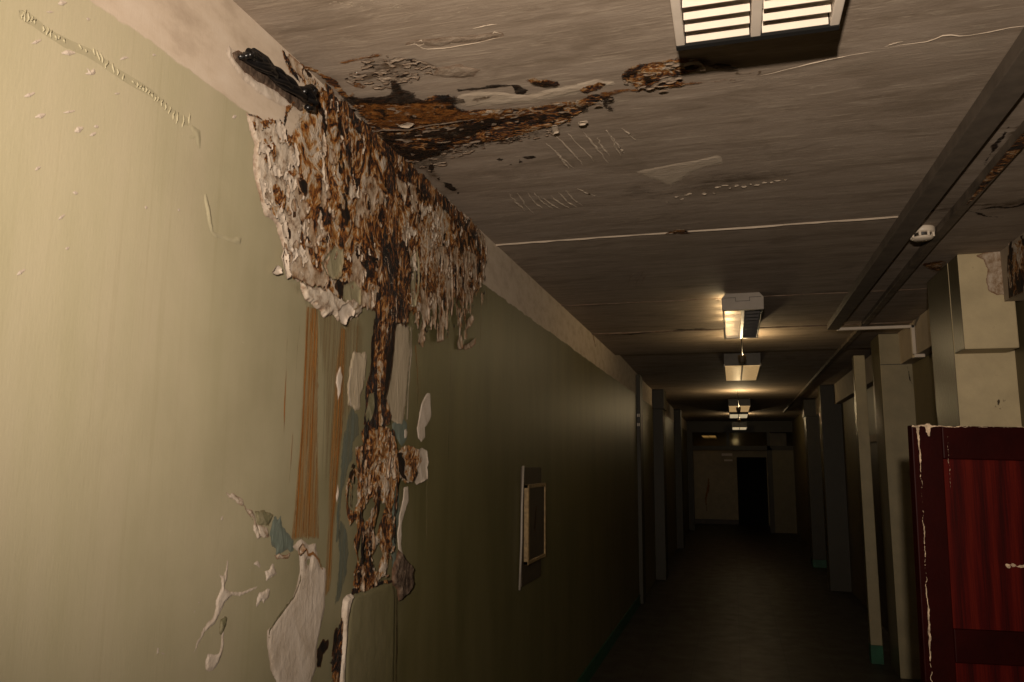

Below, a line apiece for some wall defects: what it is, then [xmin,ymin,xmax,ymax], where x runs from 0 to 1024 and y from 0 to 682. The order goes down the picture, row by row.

peeling [340,54,480,89]
flaking render [456,57,737,107]
peeling [246,112,362,325]
peeling [226,492,273,539]
corrosion [291,308,358,594]
flaking render [336,245,487,595]
peeling [194,539,338,682]